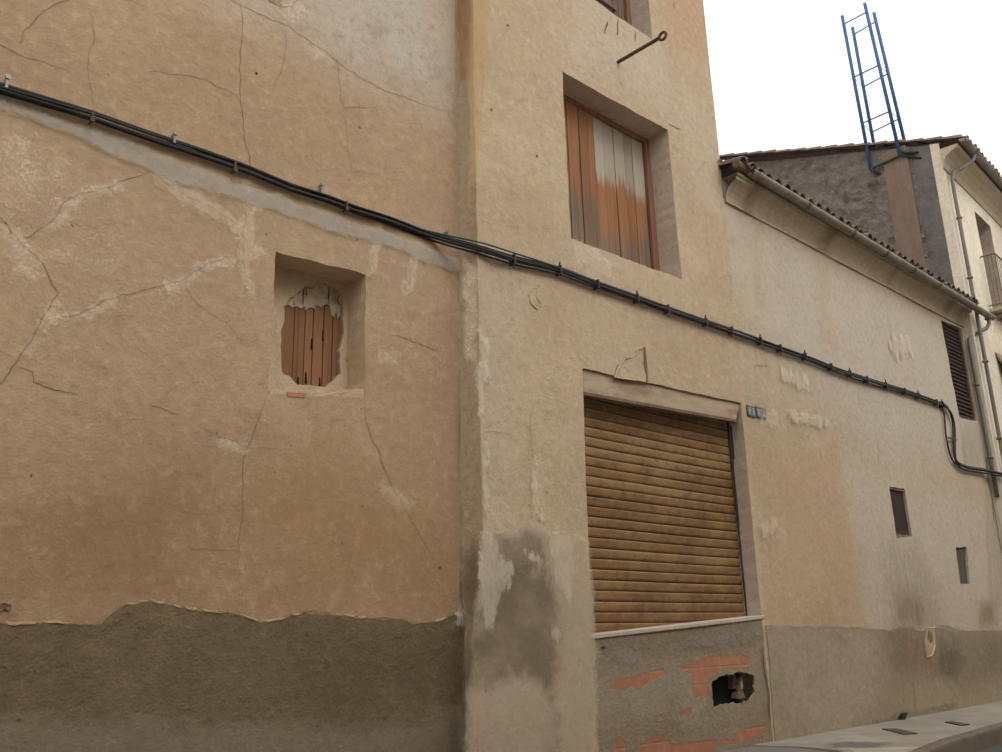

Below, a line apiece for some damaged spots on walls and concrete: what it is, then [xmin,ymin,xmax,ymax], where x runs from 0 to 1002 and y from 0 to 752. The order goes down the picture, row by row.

crack [0,0,452,394]
damp [460,534,554,752]
flaking render [610,668,666,691]
flaking render [679,654,750,715]
flaking render [638,724,766,752]